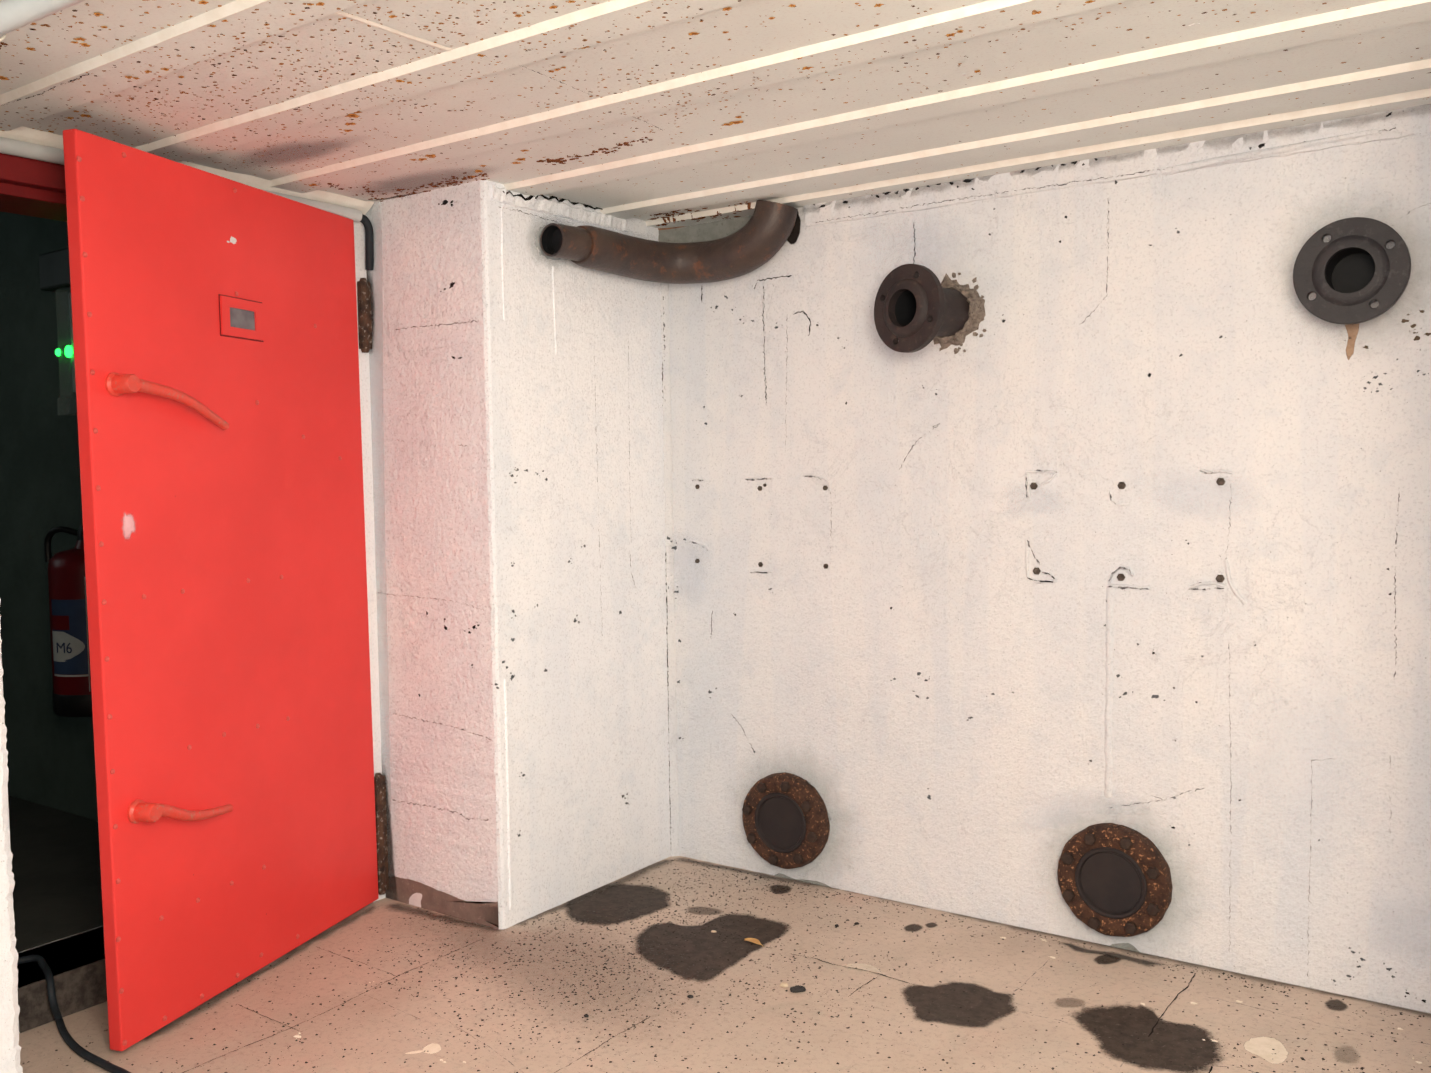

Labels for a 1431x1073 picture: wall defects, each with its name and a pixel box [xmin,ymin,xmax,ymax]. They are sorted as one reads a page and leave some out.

rust [0,0,1132,202]
rust [1345,323,1359,360]
water stain [566,884,787,981]
water stain [904,982,1015,1027]
water stain [1073,1005,1222,1073]